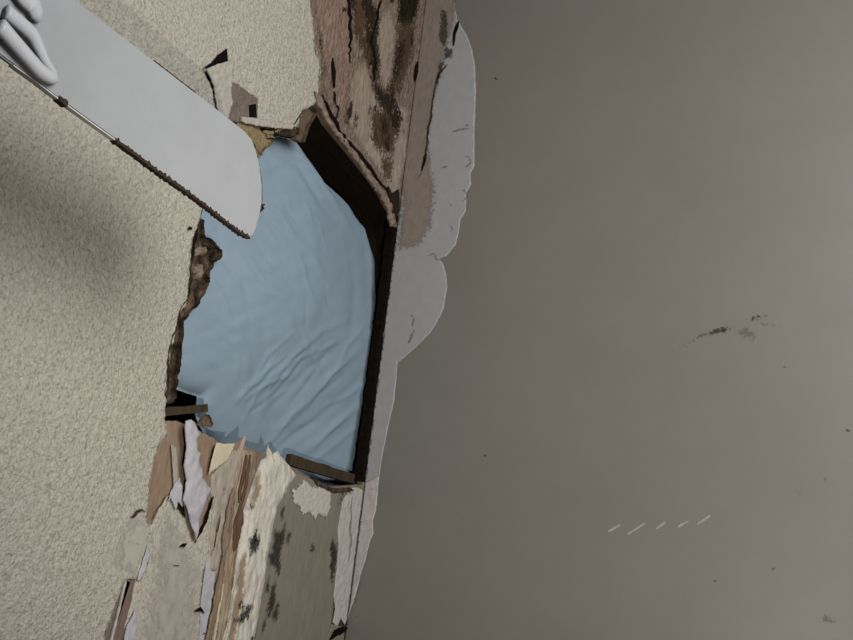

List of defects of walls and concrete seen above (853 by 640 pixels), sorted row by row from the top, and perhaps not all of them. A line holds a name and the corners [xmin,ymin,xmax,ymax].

water stain [333,0,419,193]
spalling [165,219,223,404]
peeling [254,2,476,640]
spalling [196,415,213,427]
water stain [249,472,262,509]
water stain [229,529,261,640]
mould [252,507,292,640]
crack [326,624,348,640]